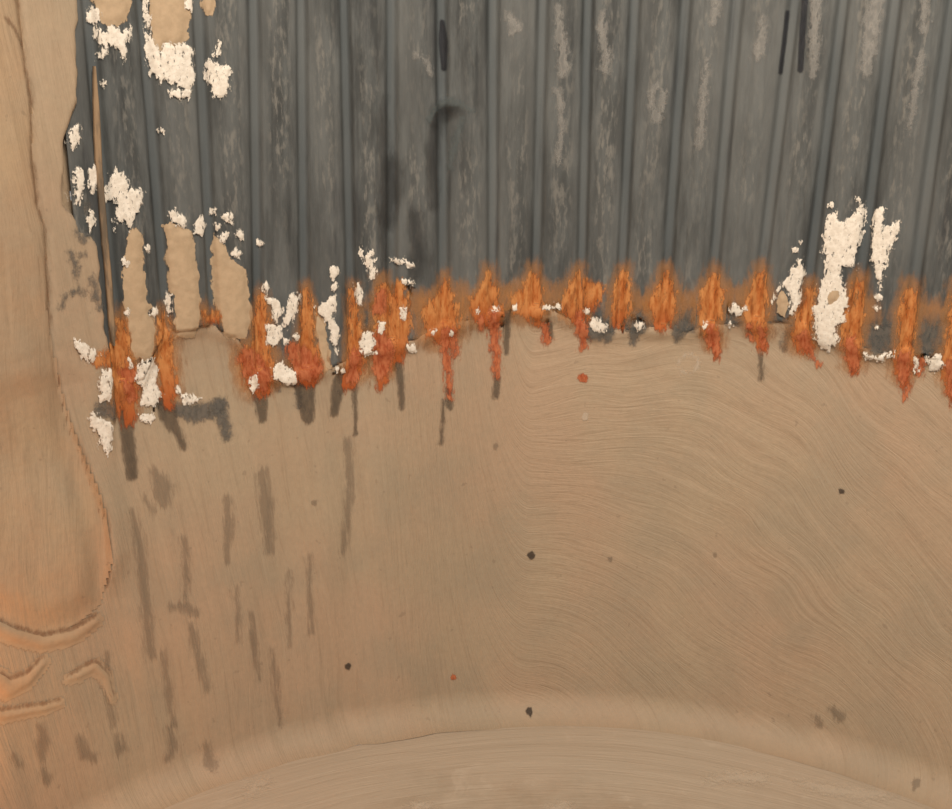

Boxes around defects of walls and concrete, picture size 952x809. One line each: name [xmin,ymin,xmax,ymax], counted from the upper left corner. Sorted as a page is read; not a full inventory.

peeling [85,0,233,101]
peeling [66,164,146,233]
peeling [167,207,244,259]
peeling [771,240,807,318]
peeling [811,196,901,352]
peeling [74,338,115,458]
rust [91,318,140,480]
rust [153,311,186,450]
leakage [170,398,232,441]
rust [235,292,274,422]
rust [284,287,324,423]
rust [331,270,553,444]